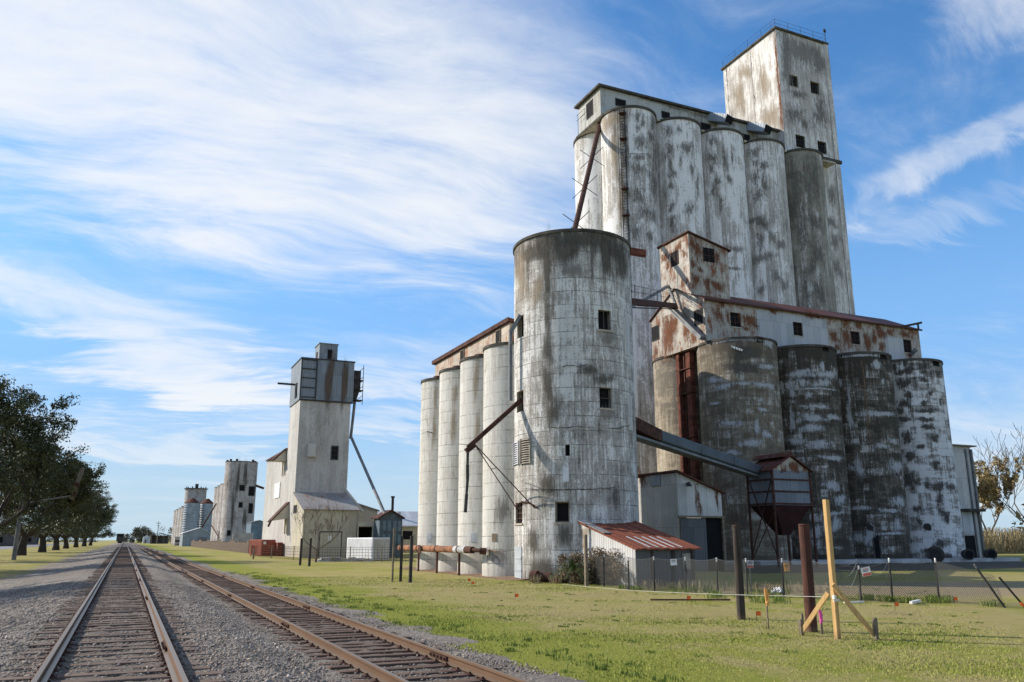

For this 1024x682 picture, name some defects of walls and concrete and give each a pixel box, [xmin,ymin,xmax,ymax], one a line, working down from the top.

leakage [772,27,831,91]
leakage [735,65,781,129]
leakage [728,217,788,294]
rust [661,234,758,331]
leakage [518,232,629,428]
rust [653,311,703,362]
leakage [724,346,759,373]
rust [829,318,912,351]
leakage [542,475,555,497]
leakage [528,528,554,573]
leakage [556,524,571,547]